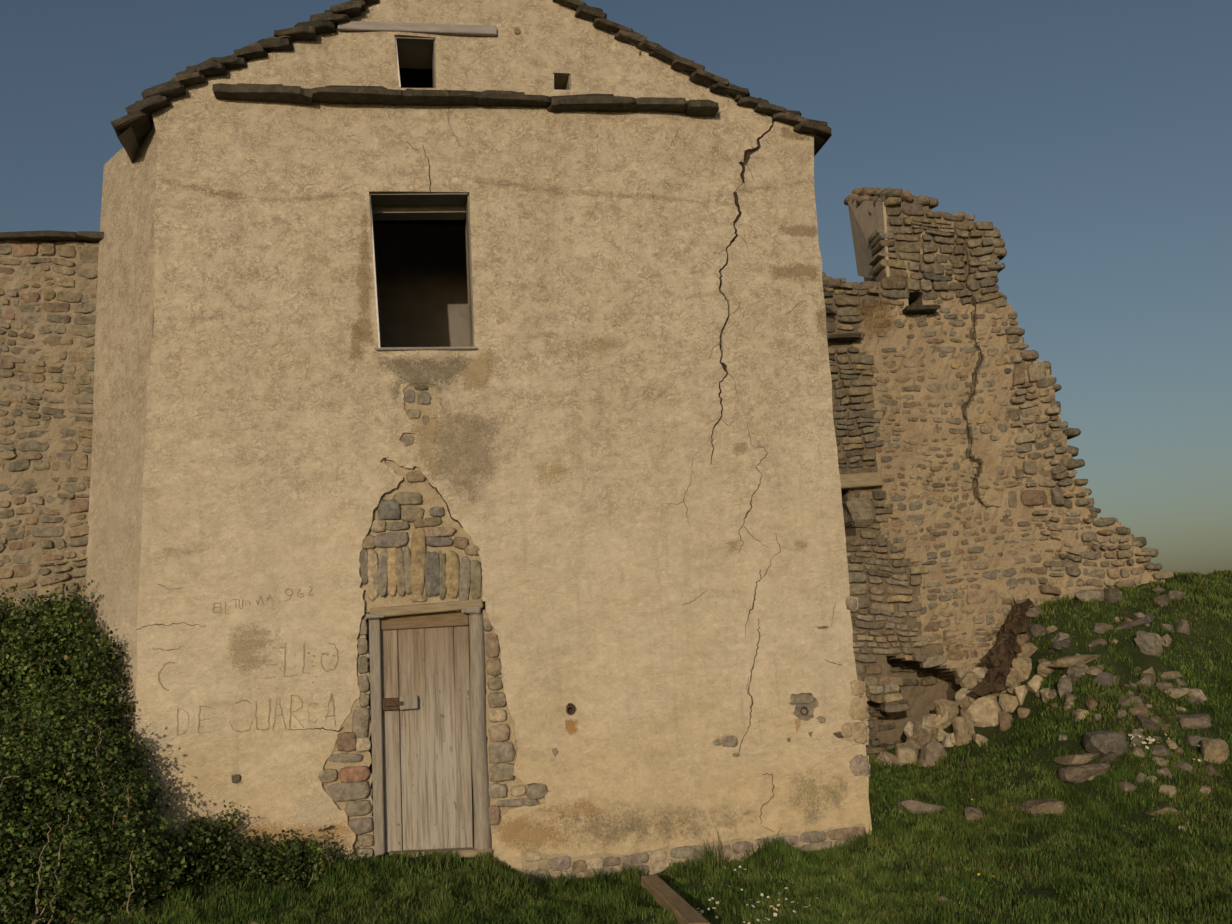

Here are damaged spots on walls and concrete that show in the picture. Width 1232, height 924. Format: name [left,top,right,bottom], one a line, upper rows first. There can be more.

spalling [399,383,437,447]
crack [666,122,781,752]
crack [963,238,1001,507]
spalling [318,459,549,859]
spalling [790,680,870,776]